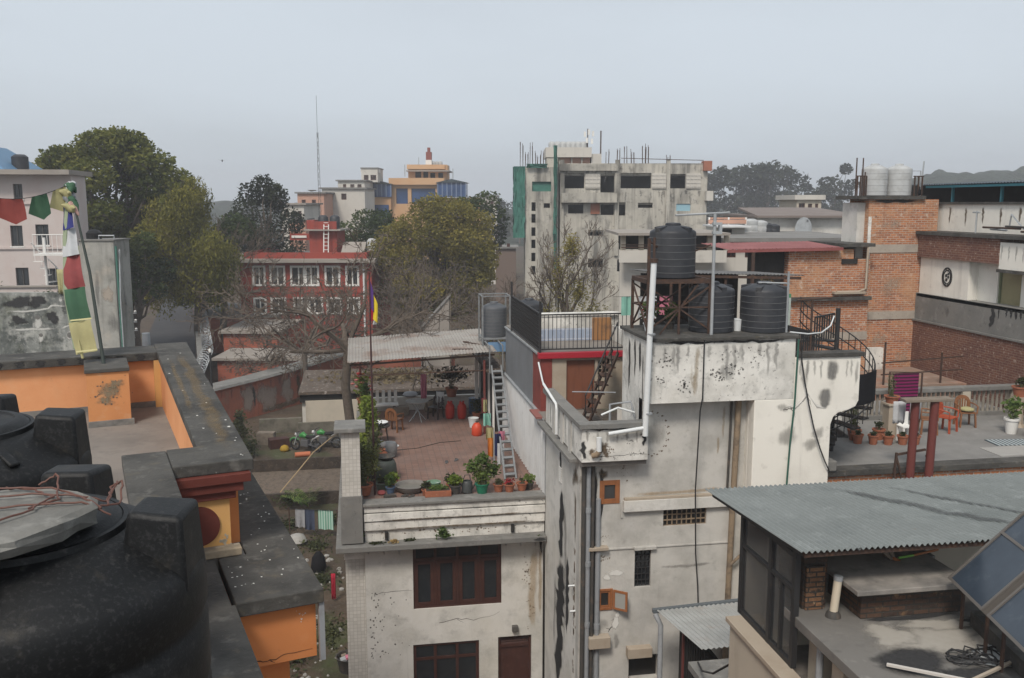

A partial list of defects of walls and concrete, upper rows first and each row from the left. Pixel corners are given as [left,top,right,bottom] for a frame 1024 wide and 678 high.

peeling [90,380,122,405]
damp [820,362,837,407]
damp [534,492,576,678]